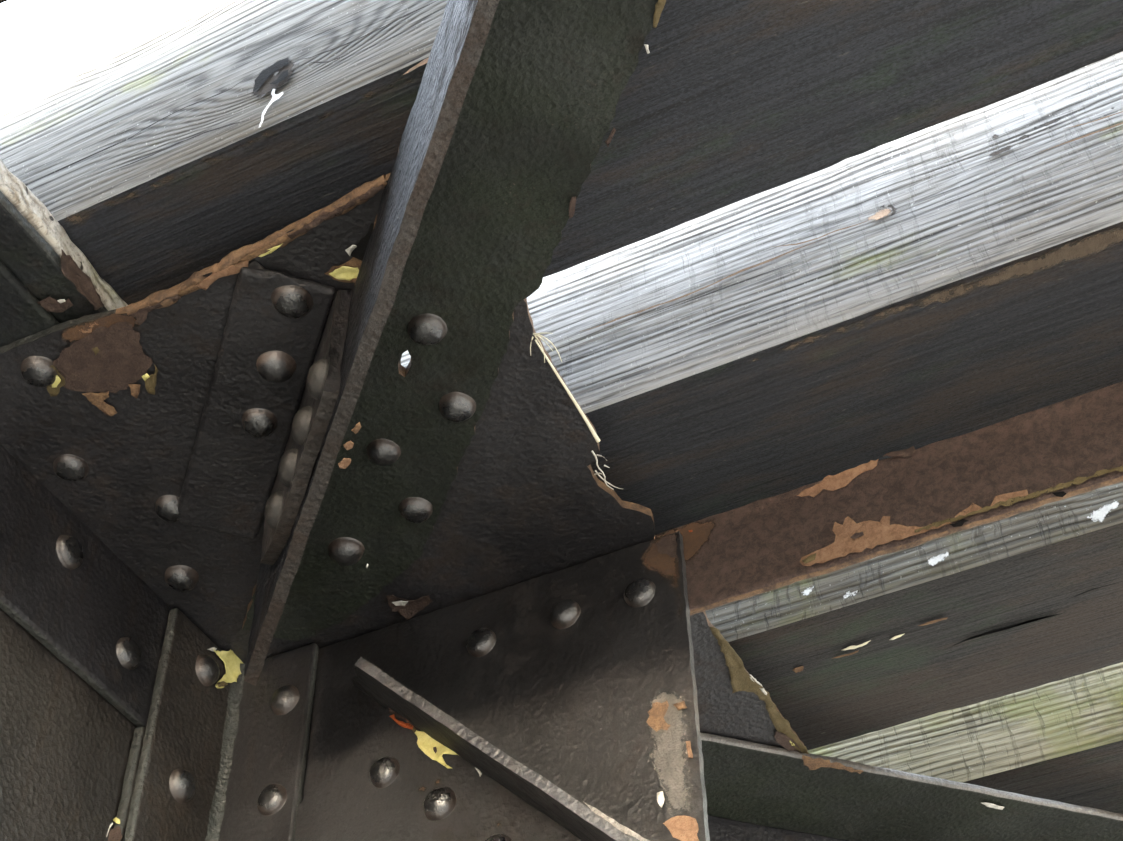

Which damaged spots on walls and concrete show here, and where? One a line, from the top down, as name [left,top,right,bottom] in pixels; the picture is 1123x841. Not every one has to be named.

rust [47,174,387,416]
rust [796,446,916,497]
rust [800,490,1028,566]
peeling [208,647,244,689]
peeling [389,708,458,768]